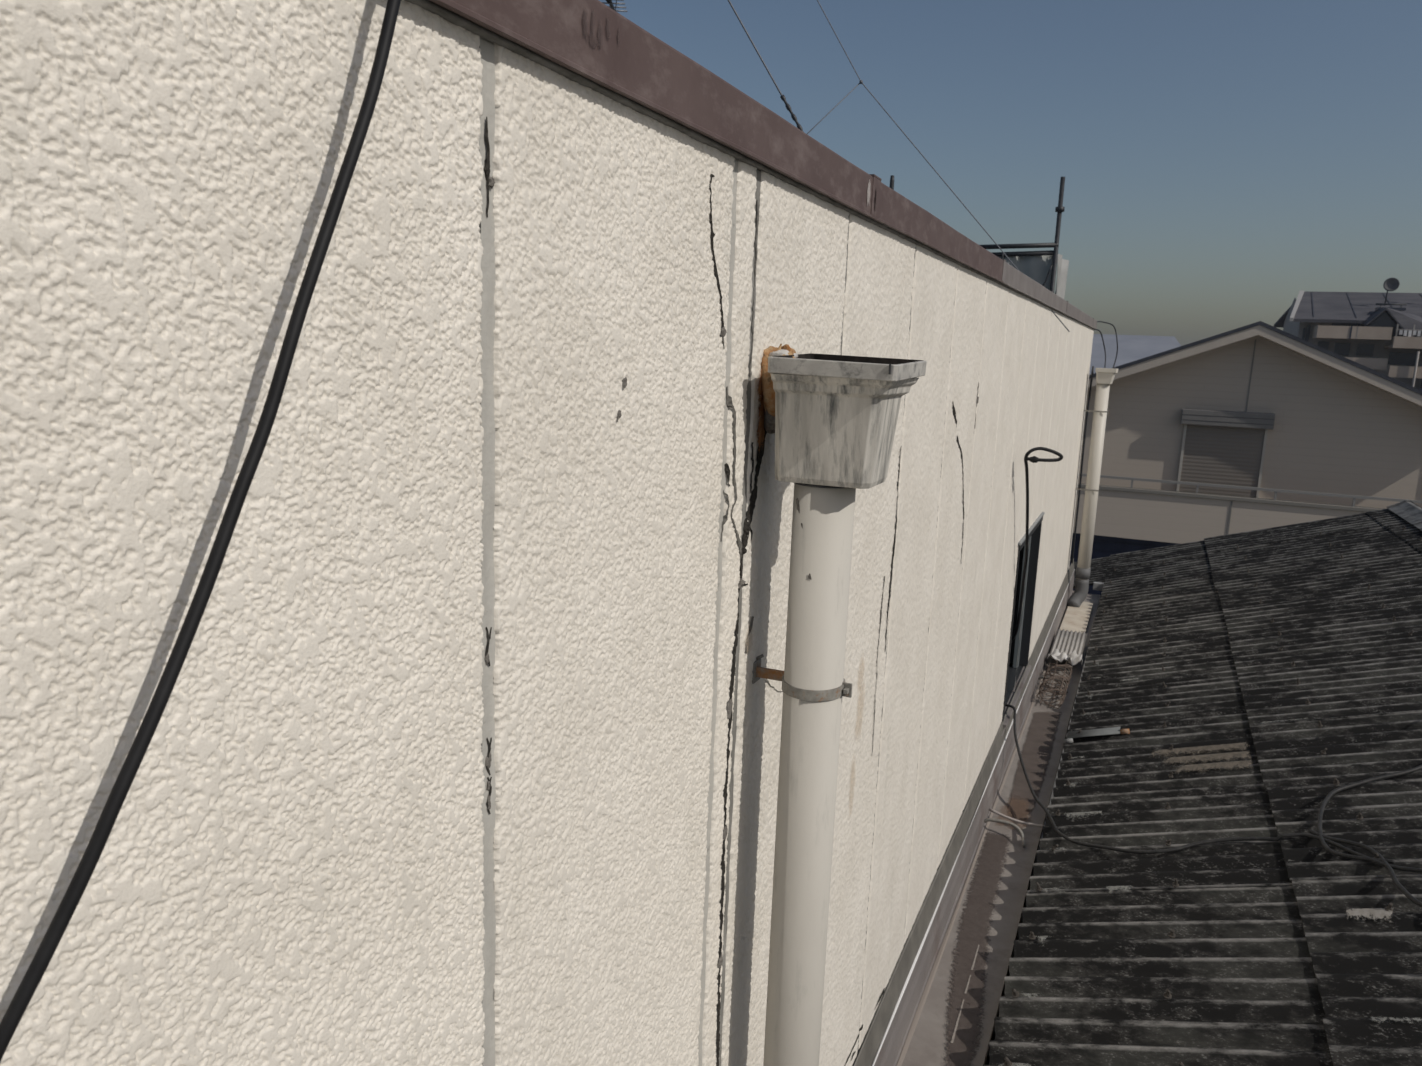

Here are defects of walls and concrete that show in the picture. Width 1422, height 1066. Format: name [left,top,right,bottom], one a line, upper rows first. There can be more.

crack [710,174,783,1066]
crack [953,403,964,560]